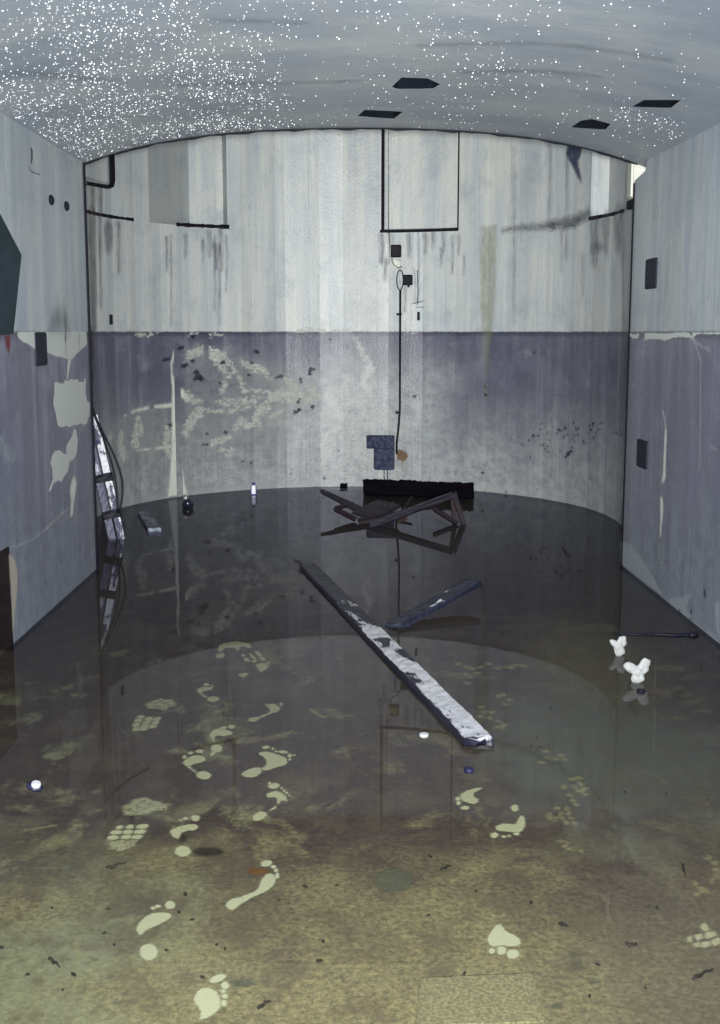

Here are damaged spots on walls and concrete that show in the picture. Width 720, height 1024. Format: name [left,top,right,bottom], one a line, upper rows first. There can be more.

peeling [17,331,90,492]
peeling [107,415,143,462]
peeling [162,330,321,457]